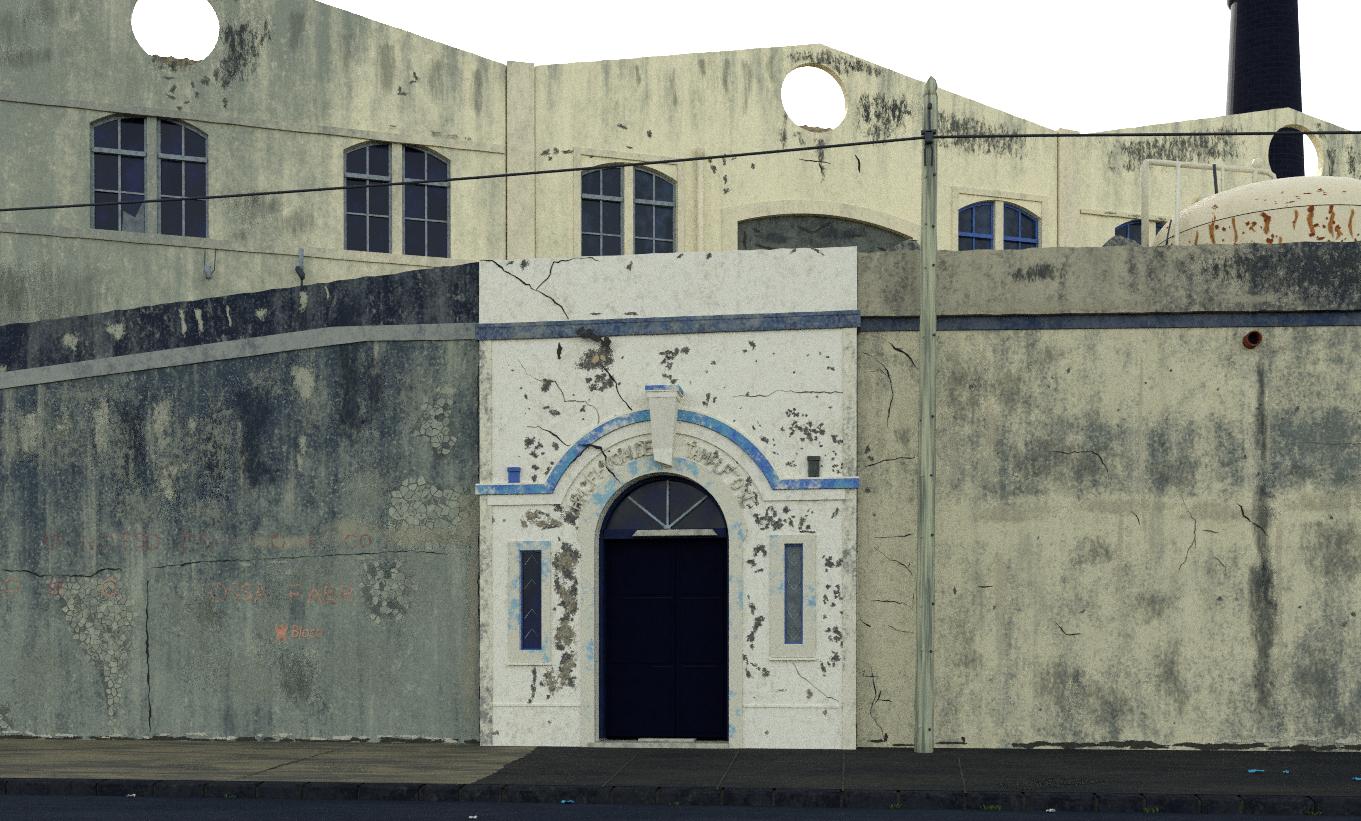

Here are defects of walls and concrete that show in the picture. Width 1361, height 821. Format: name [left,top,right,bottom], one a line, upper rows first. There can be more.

water stain [218,20,271,88]
water stain [787,51,881,77]
water stain [857,93,911,146]
water stain [938,113,1027,159]
water stain [1107,125,1245,172]
corrosion [1189,188,1359,245]
crack [480,257,599,319]
water stain [179,308,204,338]
flaking render [557,313,623,420]
peeling [520,378,560,416]
water stain [0,341,445,528]
peeling [492,483,586,703]